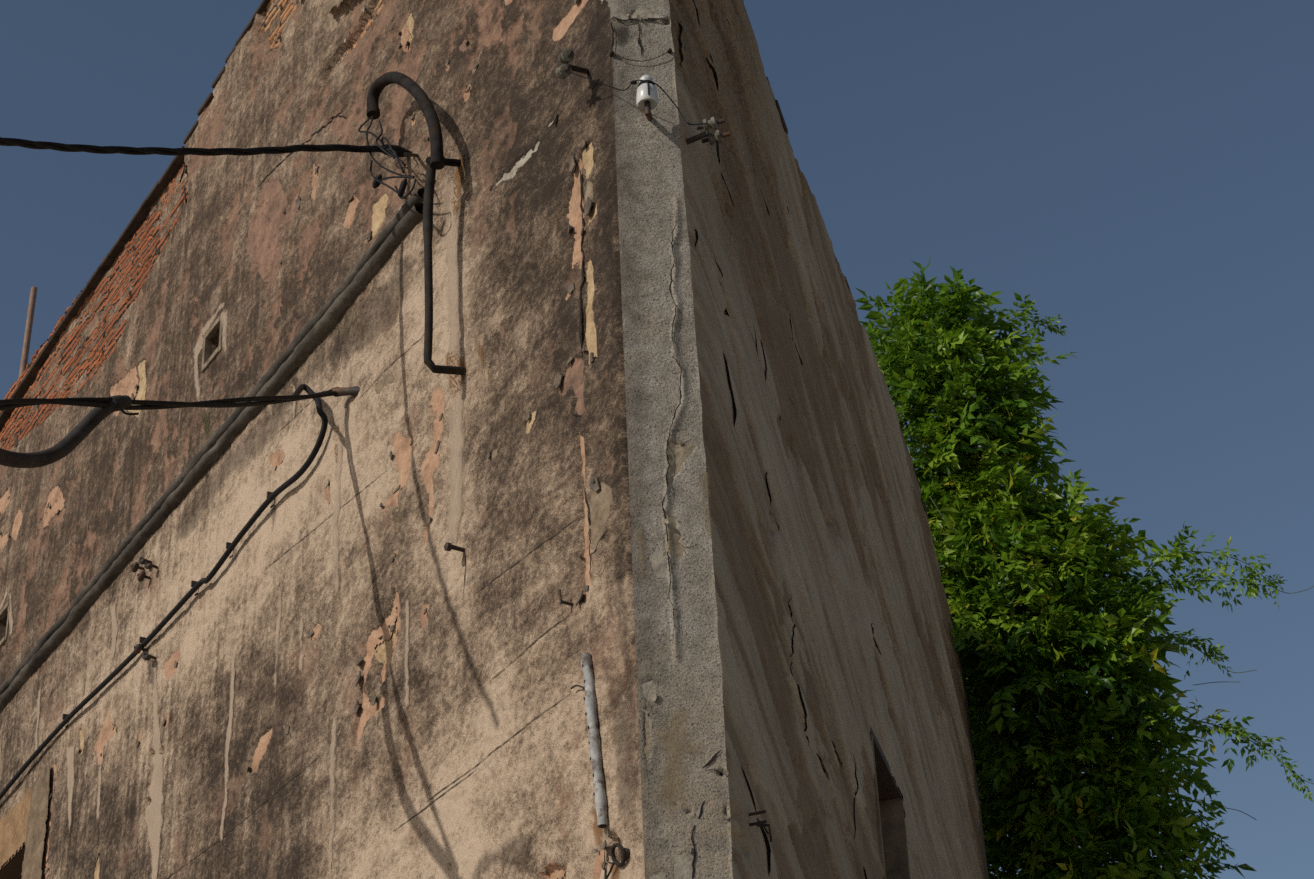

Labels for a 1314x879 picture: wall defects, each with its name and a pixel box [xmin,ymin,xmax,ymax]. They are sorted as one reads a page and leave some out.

flaking render [553,0,668,41]
water stain [0,591,13,633]
flaking render [0,162,188,451]
water stain [110,604,118,658]
water stain [146,660,165,879]
water stain [220,655,235,840]
flaking render [353,591,401,746]
water stain [445,184,464,540]
flaking render [555,139,597,417]
flaking render [575,436,613,606]
crack [650,202,708,643]
crack [723,314,790,553]